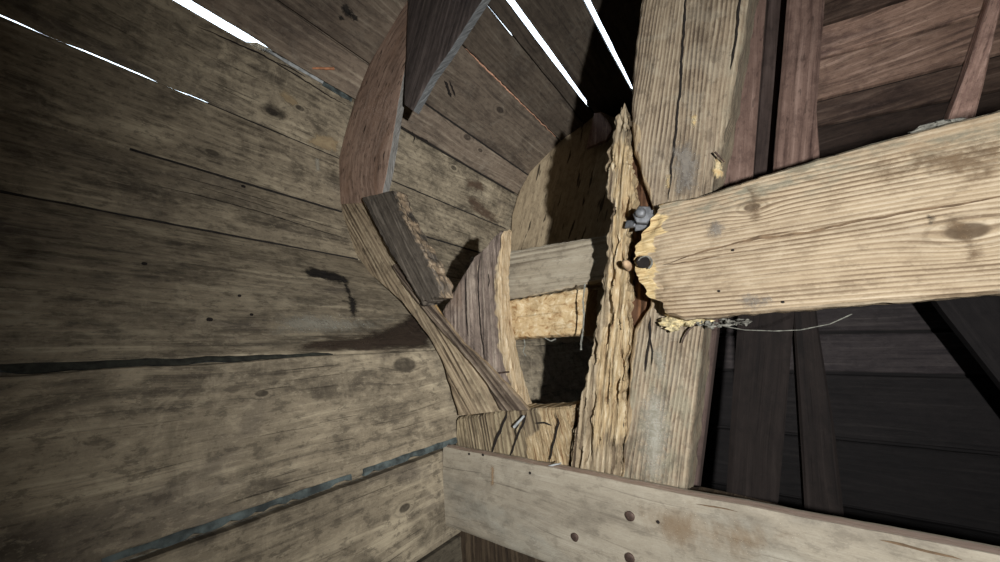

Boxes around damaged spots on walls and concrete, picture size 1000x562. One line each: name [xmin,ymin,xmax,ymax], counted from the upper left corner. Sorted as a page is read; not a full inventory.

crack [668,0,686,200]
leakage [279,267,429,351]
crack [492,413,560,461]